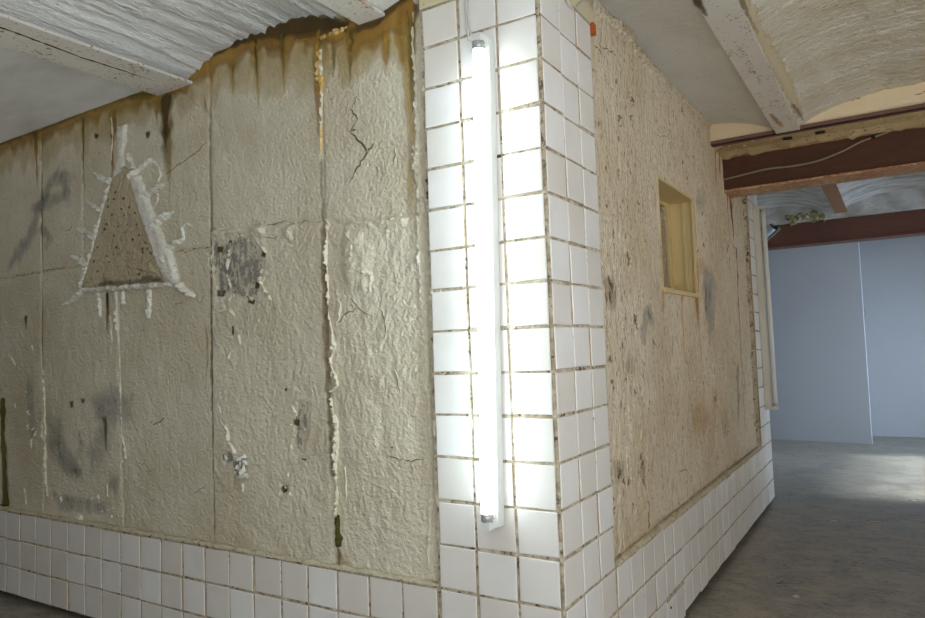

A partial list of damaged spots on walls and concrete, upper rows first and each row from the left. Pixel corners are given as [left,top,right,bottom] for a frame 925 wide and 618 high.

damp [313,26,348,152]
crack [348,95,397,184]
spalling [211,229,272,359]
spalling [222,424,250,492]